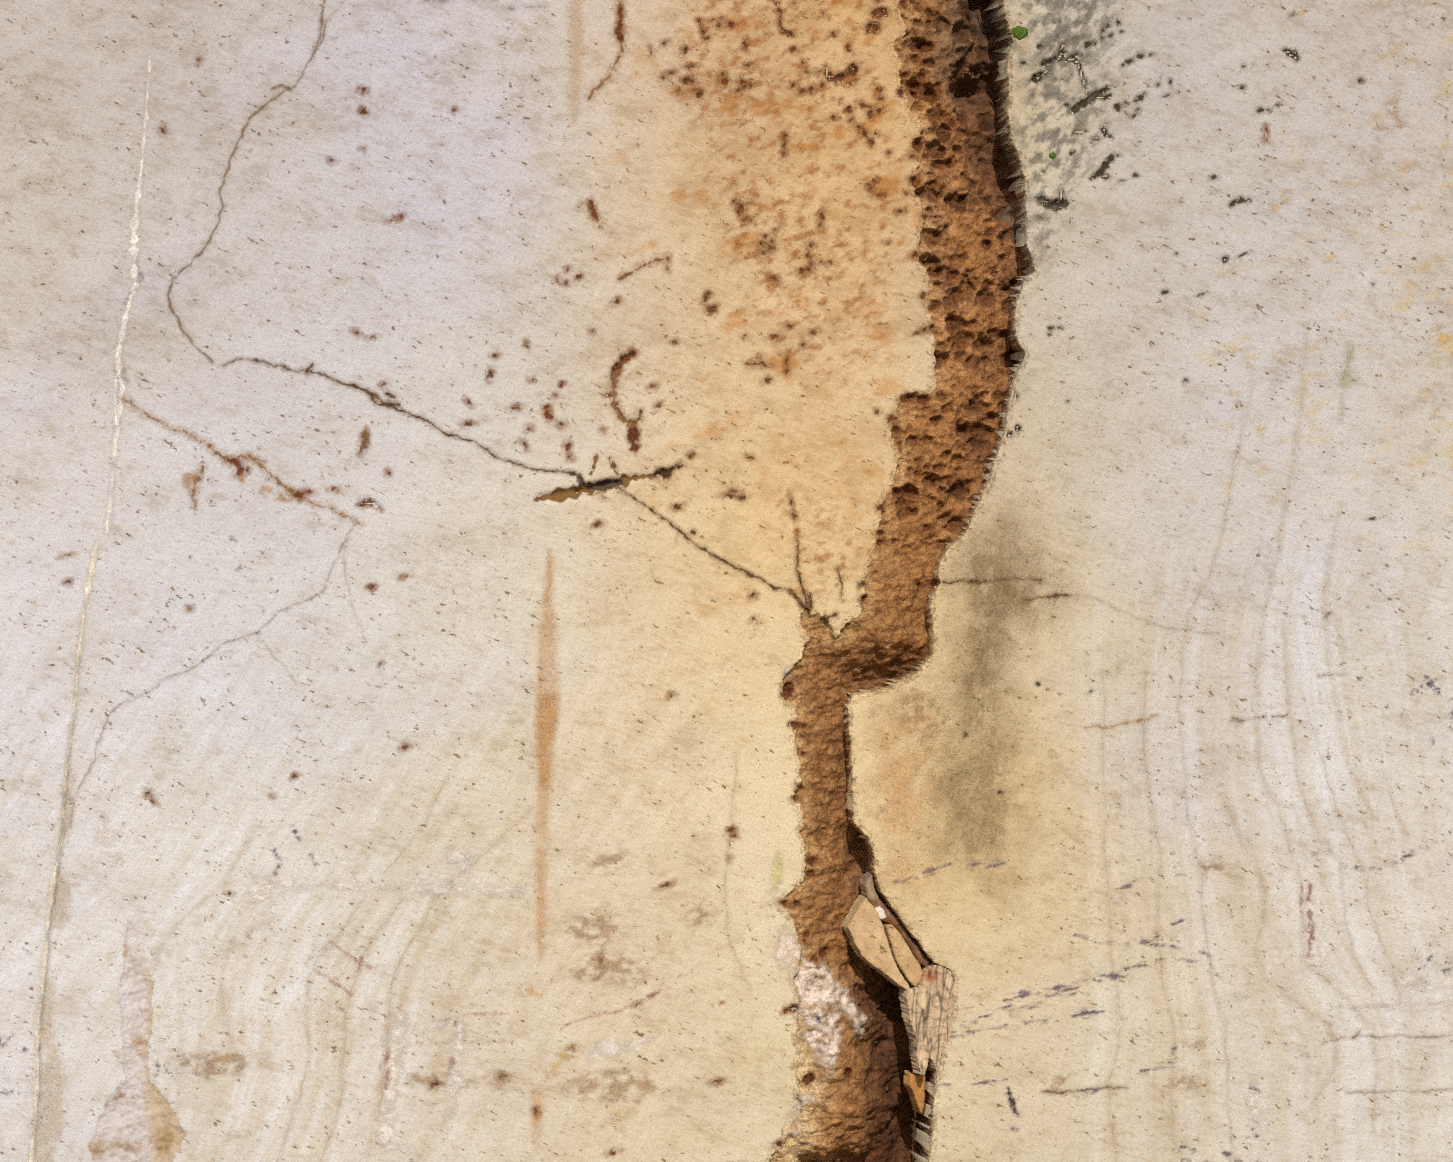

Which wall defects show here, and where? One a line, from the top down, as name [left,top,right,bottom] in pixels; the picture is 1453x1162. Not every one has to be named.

spalling [615,7,624,41]
spalling [661,16,753,98]
spalling [790,0,942,155]
leakage [1022,0,1109,202]
spalling [866,137,951,213]
crack [168,1,582,477]
crack [124,399,359,524]
spalling [523,381,696,502]
spalling [602,349,661,452]
spalling [875,393,968,447]
leakage [776,930,866,1072]
peeling [841,895,923,990]